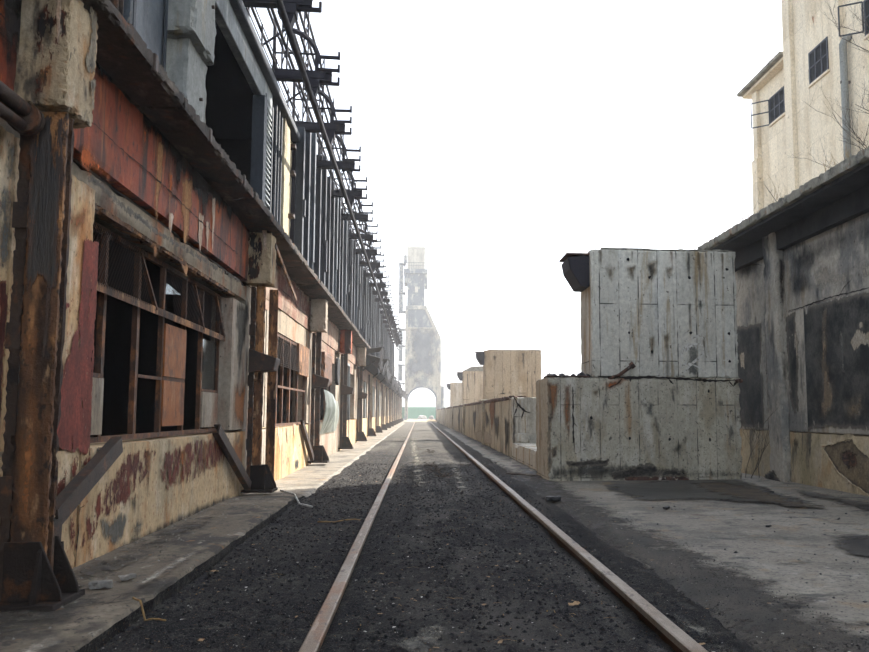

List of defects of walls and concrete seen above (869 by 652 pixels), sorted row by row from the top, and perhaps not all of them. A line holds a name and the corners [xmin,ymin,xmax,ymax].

corrosion [81,146,109,177]
corrosion [549,384,570,437]
leakage [821,313,833,415]
peeling [786,292,869,496]
peeling [70,439,224,549]